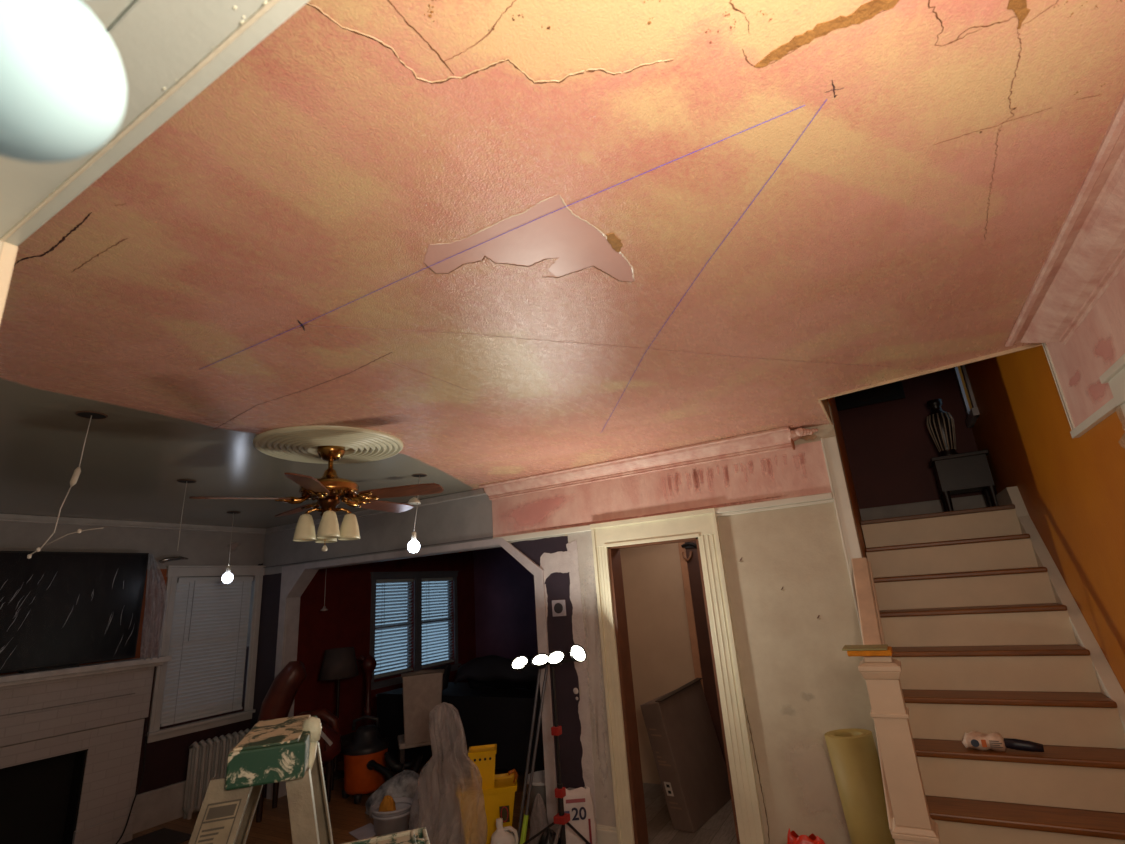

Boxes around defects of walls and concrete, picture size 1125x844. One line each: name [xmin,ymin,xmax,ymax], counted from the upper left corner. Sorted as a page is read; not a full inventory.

crack [306,0,673,84]
crack [705,0,772,66]
peeling [936,0,1098,240]
crack [14,204,125,266]
crack [71,239,126,273]
peeling [423,194,635,282]